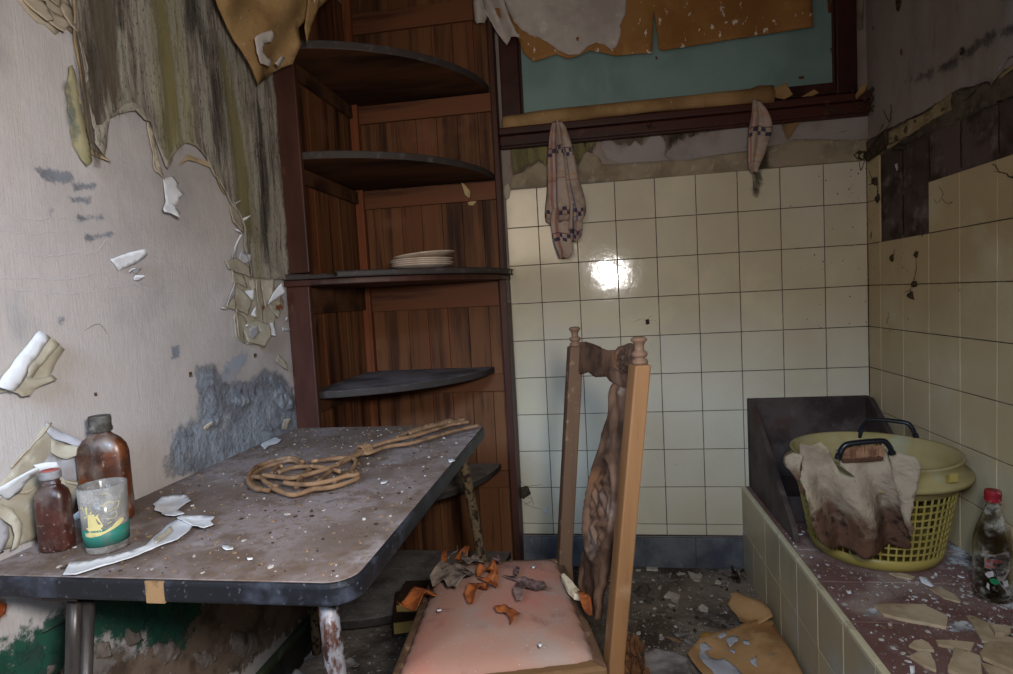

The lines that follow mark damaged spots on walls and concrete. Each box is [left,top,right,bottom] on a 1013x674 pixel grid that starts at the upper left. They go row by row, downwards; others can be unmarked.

peeling [18,0,79,35]
peeling [254,30,285,67]
peeling [65,65,92,166]
peeling [577,56,1013,242]
peeling [36,169,96,204]
peeling [163,176,184,218]
peeling [503,161,547,200]
peeling [110,249,147,281]
peeling [221,200,291,358]
peeling [261,437,281,449]
peeling [0,606,66,674]
flaking render [93,600,309,674]